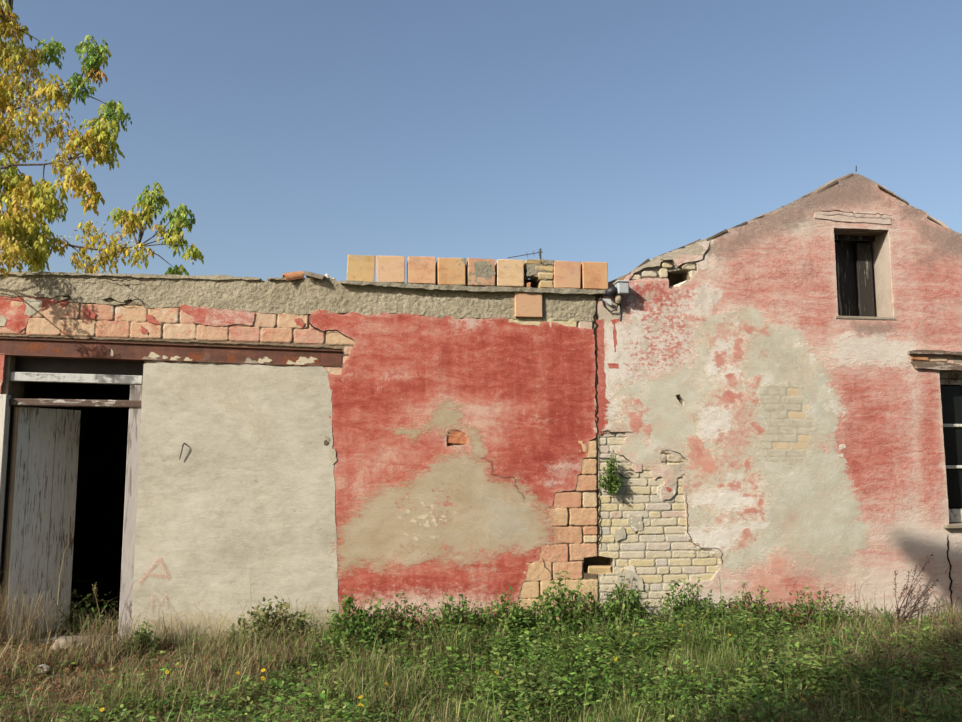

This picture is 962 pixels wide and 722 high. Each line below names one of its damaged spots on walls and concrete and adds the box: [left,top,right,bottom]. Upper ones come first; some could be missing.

crack [0,276,148,306]
crack [644,243,710,272]
spalling [0,297,355,375]
peeling [333,239,917,627]
crack [945,536,953,605]